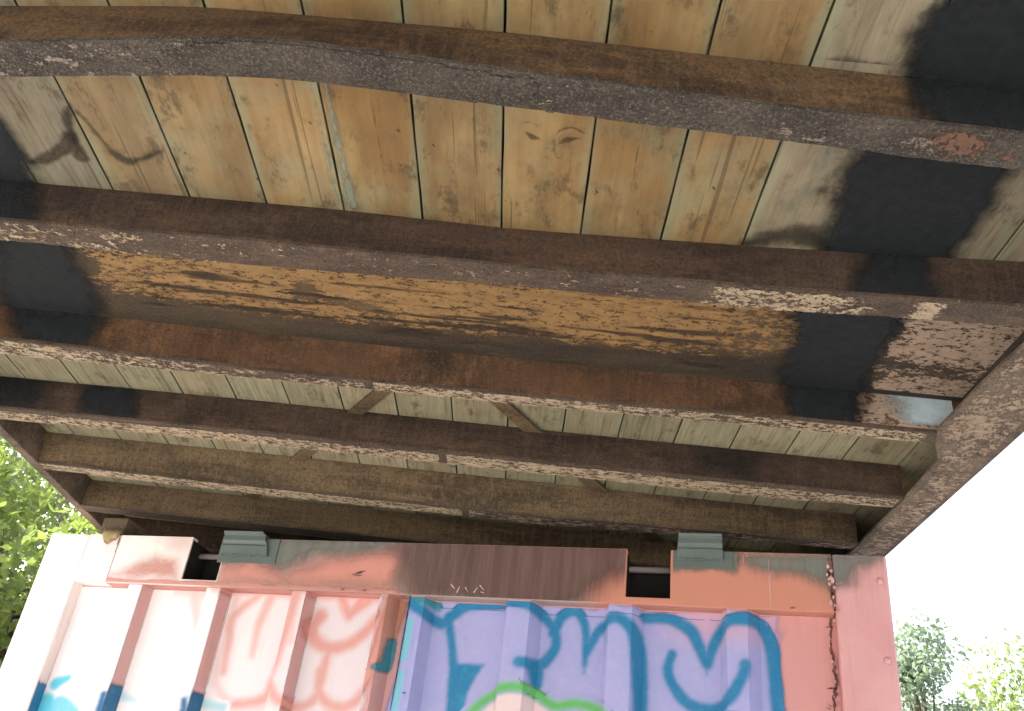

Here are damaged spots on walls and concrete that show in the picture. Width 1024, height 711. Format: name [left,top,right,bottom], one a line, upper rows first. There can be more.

rust [914,130,1021,166]
peeling [0,223,875,359]
peeling [0,302,1024,556]
crack [826,557,838,711]